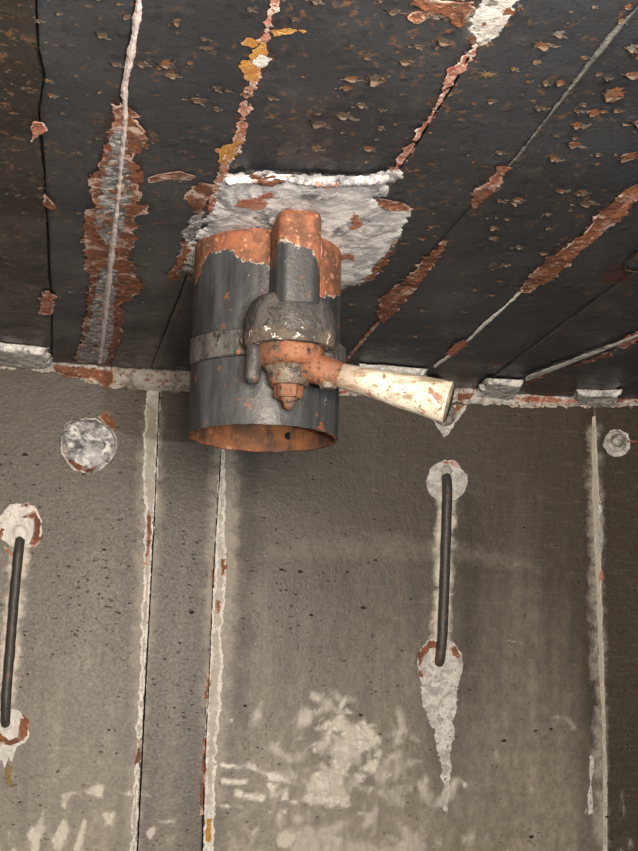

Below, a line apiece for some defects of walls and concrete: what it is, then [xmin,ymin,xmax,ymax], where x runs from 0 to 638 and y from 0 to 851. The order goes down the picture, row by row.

rust [407,0,475,28]
rust [53,0,306,388]
rust [467,165,513,209]
peeling [167,213,203,281]
rust [374,239,448,323]
rust [516,185,638,293]
rust [508,395,577,405]
damp [204,448,247,808]
damp [421,685,458,813]
damp [247,764,291,814]
damp [322,795,350,808]